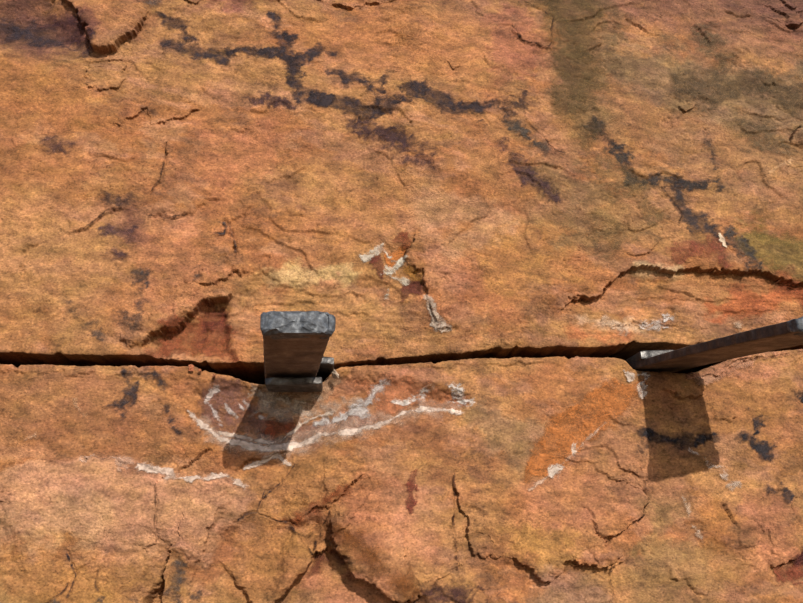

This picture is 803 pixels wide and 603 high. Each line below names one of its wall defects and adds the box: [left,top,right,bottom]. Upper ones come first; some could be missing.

water stain [0,16,95,54]
water stain [159,11,561,204]
water stain [544,0,605,135]
water stain [672,25,803,111]
water stain [605,141,762,271]
water stain [638,428,717,450]
water stain [740,415,777,461]